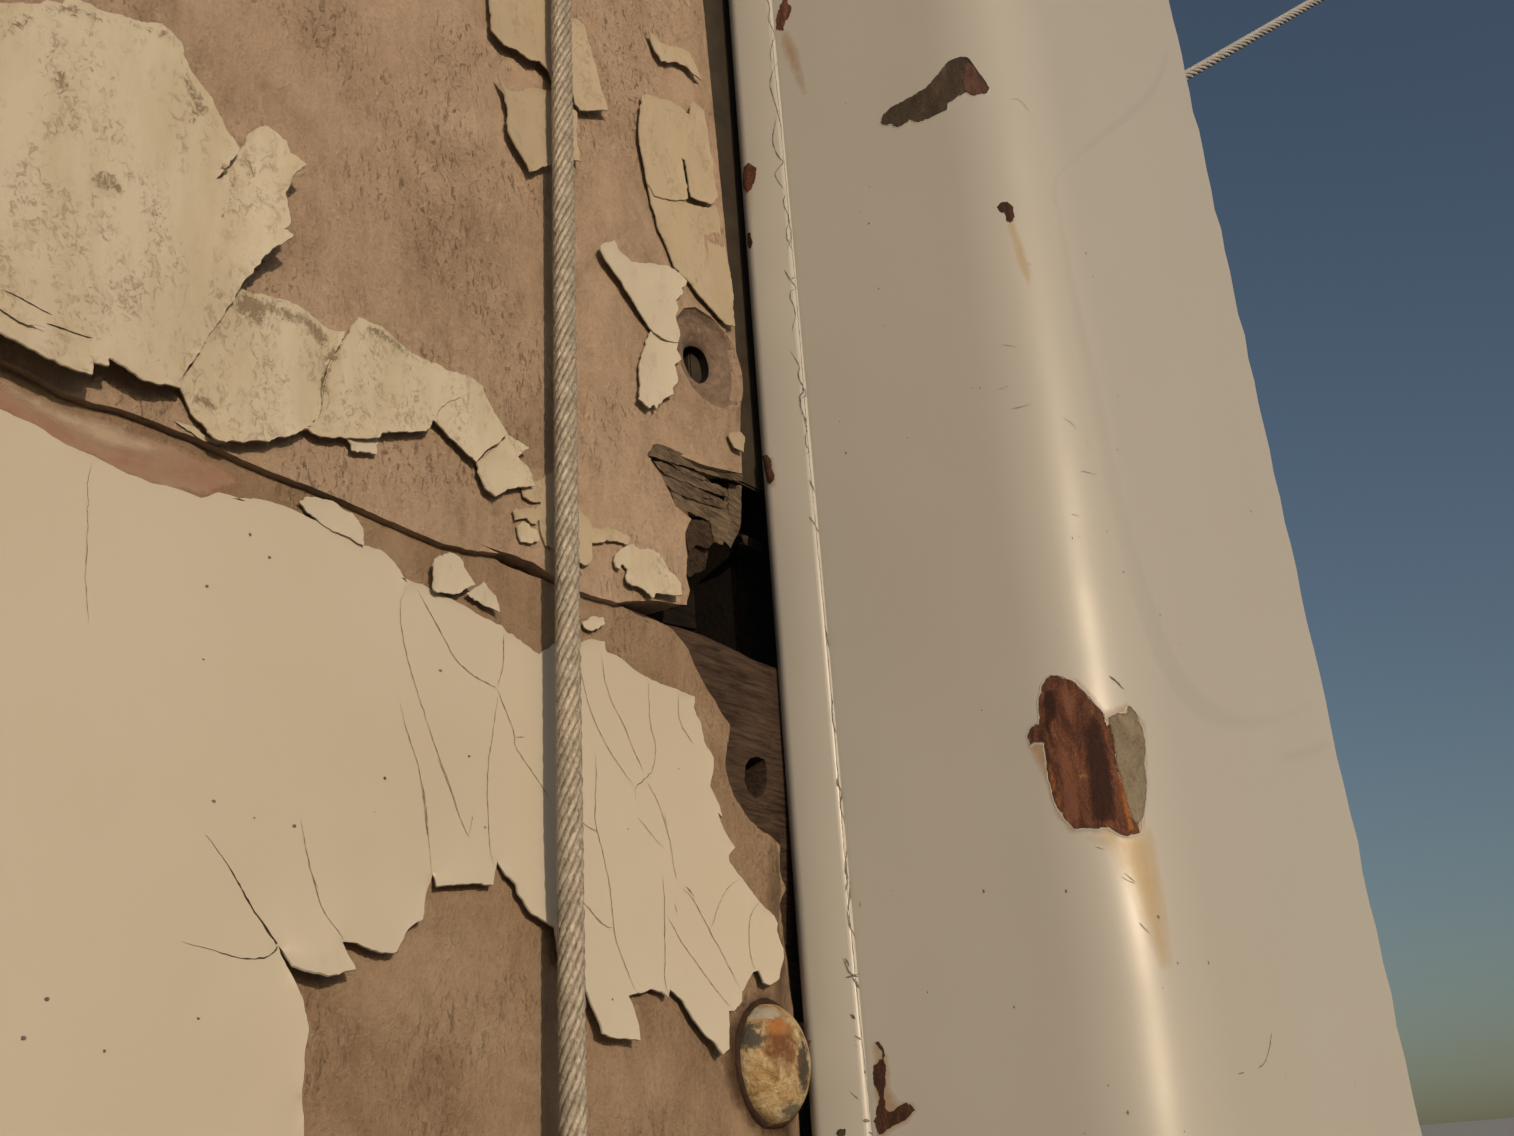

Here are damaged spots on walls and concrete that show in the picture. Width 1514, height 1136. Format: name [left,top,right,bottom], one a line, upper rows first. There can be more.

peeling [0,0,555,548]
peeling [599,94,735,409]
corrosion [997,202,1015,223]
spalling [578,444,765,598]
crack [187,835,278,959]
peeling [0,385,559,1136]
crack [301,822,344,940]
crack [400,589,551,873]
crack [580,656,758,1010]
peeling [580,616,784,1136]
corrosion [1025,673,1148,839]
corrosion [873,1041,915,1135]